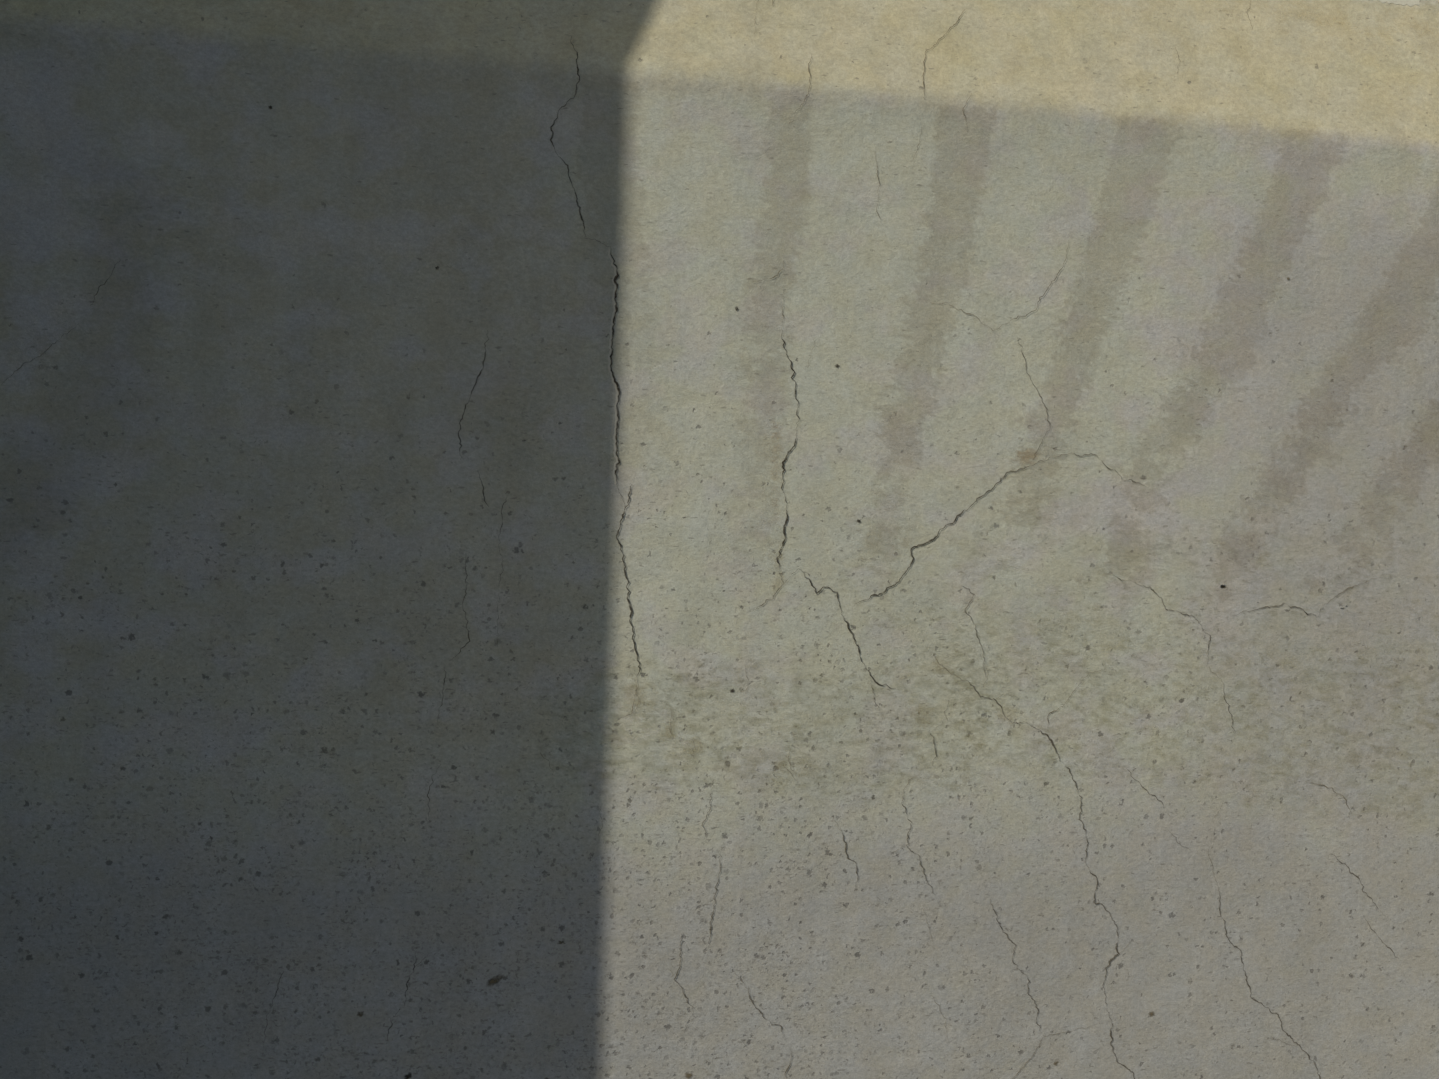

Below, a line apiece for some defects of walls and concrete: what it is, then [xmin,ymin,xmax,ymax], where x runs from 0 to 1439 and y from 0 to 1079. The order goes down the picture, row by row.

crack [550,37,640,720]
crack [754,245,1144,708]
crack [670,720,722,1015]
crack [737,975,791,1078]
crack [834,820,858,886]
crack [892,587,1135,1079]
crack [1126,768,1320,1079]